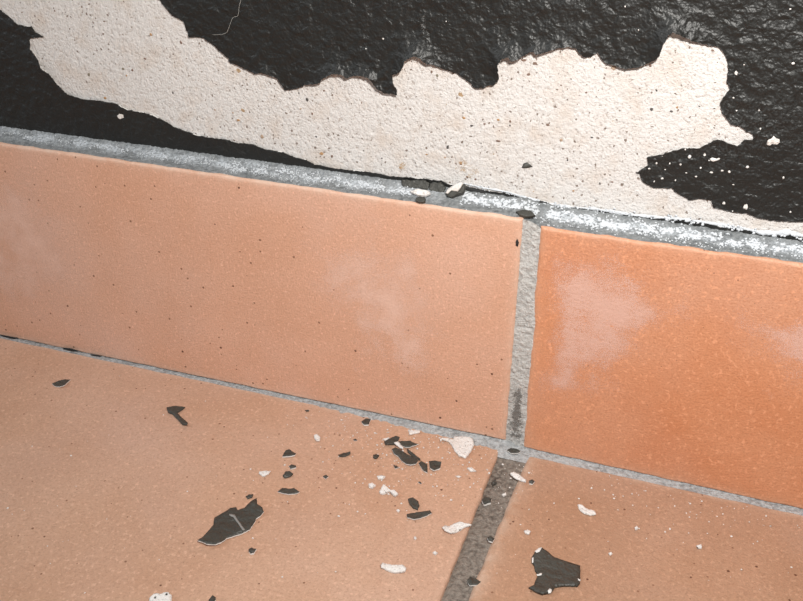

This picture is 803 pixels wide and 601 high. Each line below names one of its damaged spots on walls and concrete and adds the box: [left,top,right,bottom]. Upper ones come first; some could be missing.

peeling [0,0,803,238]
damp [460,183,803,259]
damp [520,240,695,403]